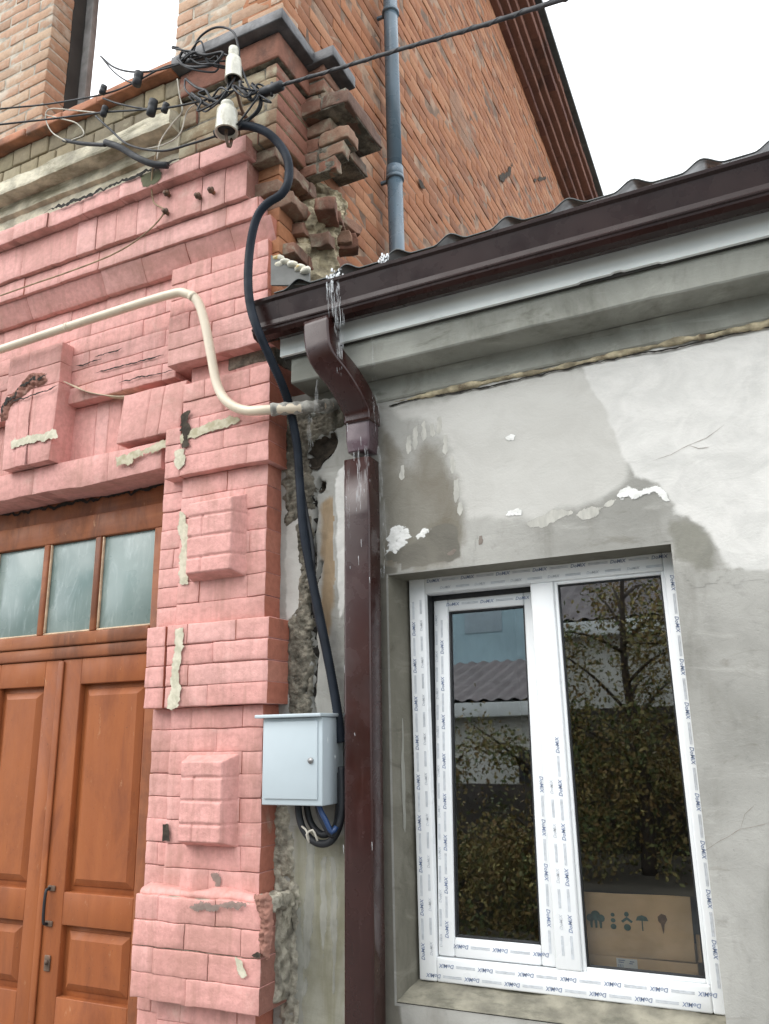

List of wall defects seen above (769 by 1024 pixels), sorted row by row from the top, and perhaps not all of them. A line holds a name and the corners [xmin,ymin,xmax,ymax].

crack [49,157,185,210]
spalling [295,183,362,281]
crack [77,348,172,382]
spalling [0,373,48,422]
peeling [116,410,240,470]
peeling [506,486,670,528]
spalling [281,408,345,714]
peeling [384,525,429,556]
damp [656,509,731,588]
spalling [252,805,301,1024]